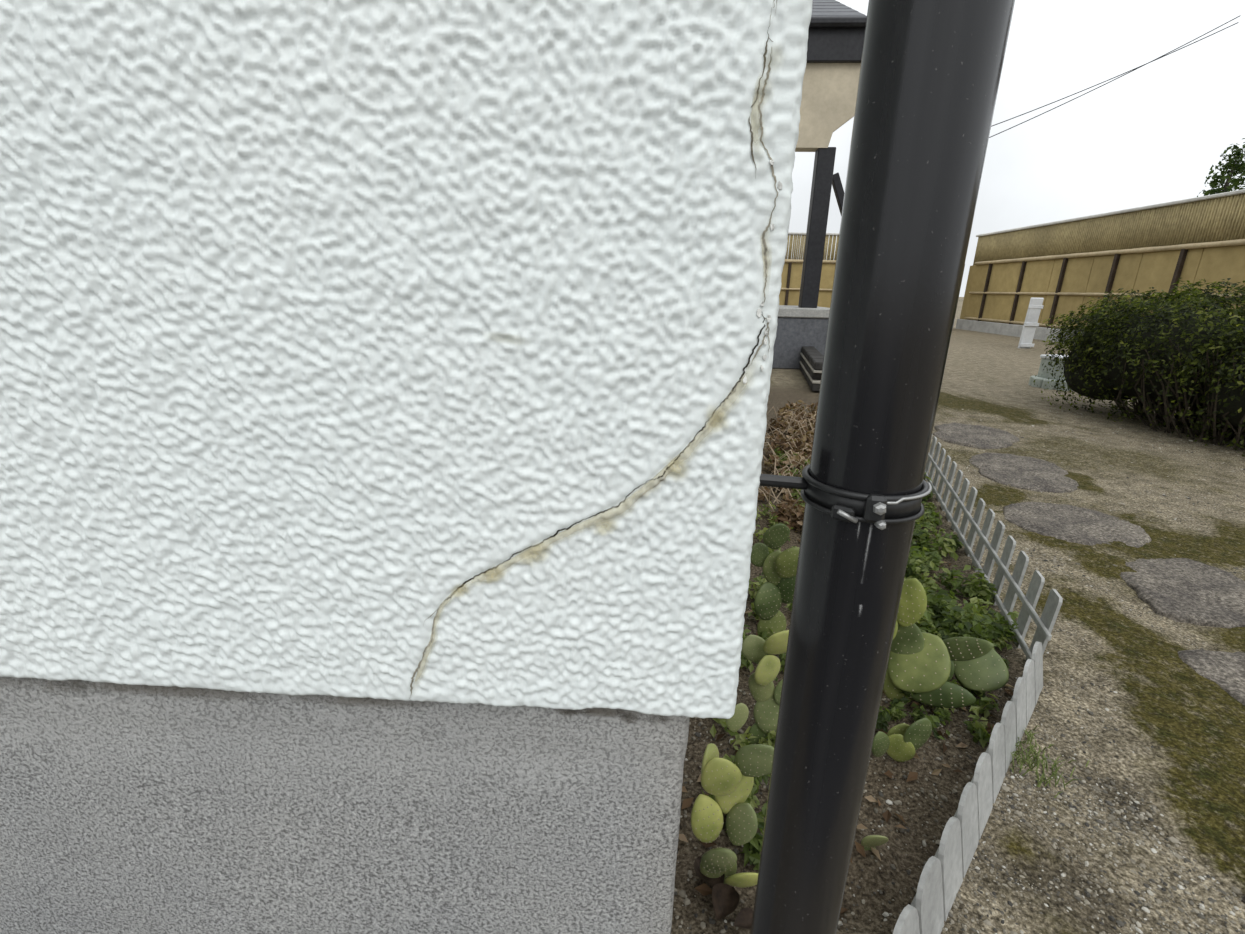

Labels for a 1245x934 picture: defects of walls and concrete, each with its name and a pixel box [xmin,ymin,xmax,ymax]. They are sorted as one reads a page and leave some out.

crack [409,0,778,699]